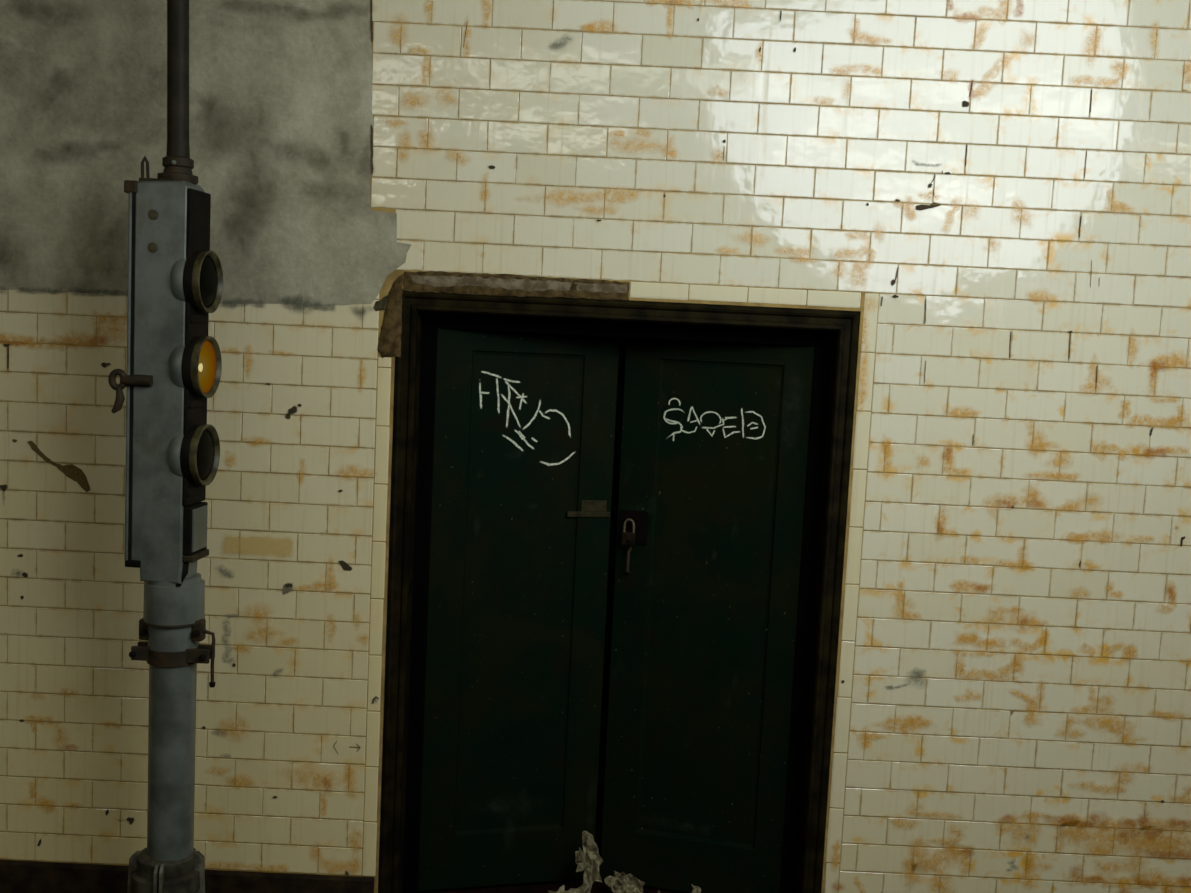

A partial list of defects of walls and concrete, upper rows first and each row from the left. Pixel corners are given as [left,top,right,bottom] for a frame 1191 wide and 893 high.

peeling [374,295,388,311]